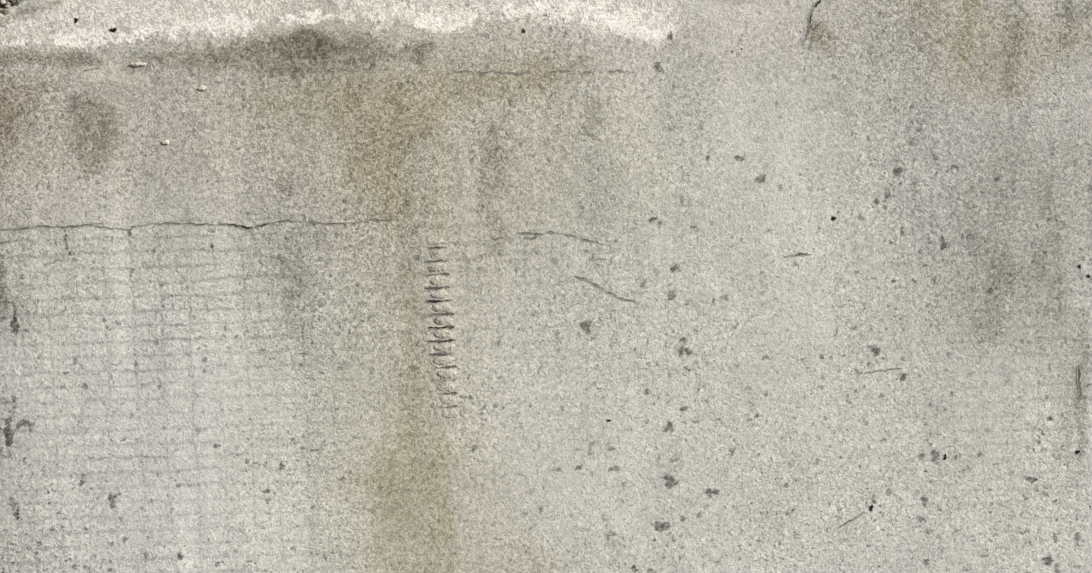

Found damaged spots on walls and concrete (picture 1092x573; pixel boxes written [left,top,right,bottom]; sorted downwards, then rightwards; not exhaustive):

peeling [0,0,22,14]
crack [804,0,824,50]
crack [0,218,395,243]